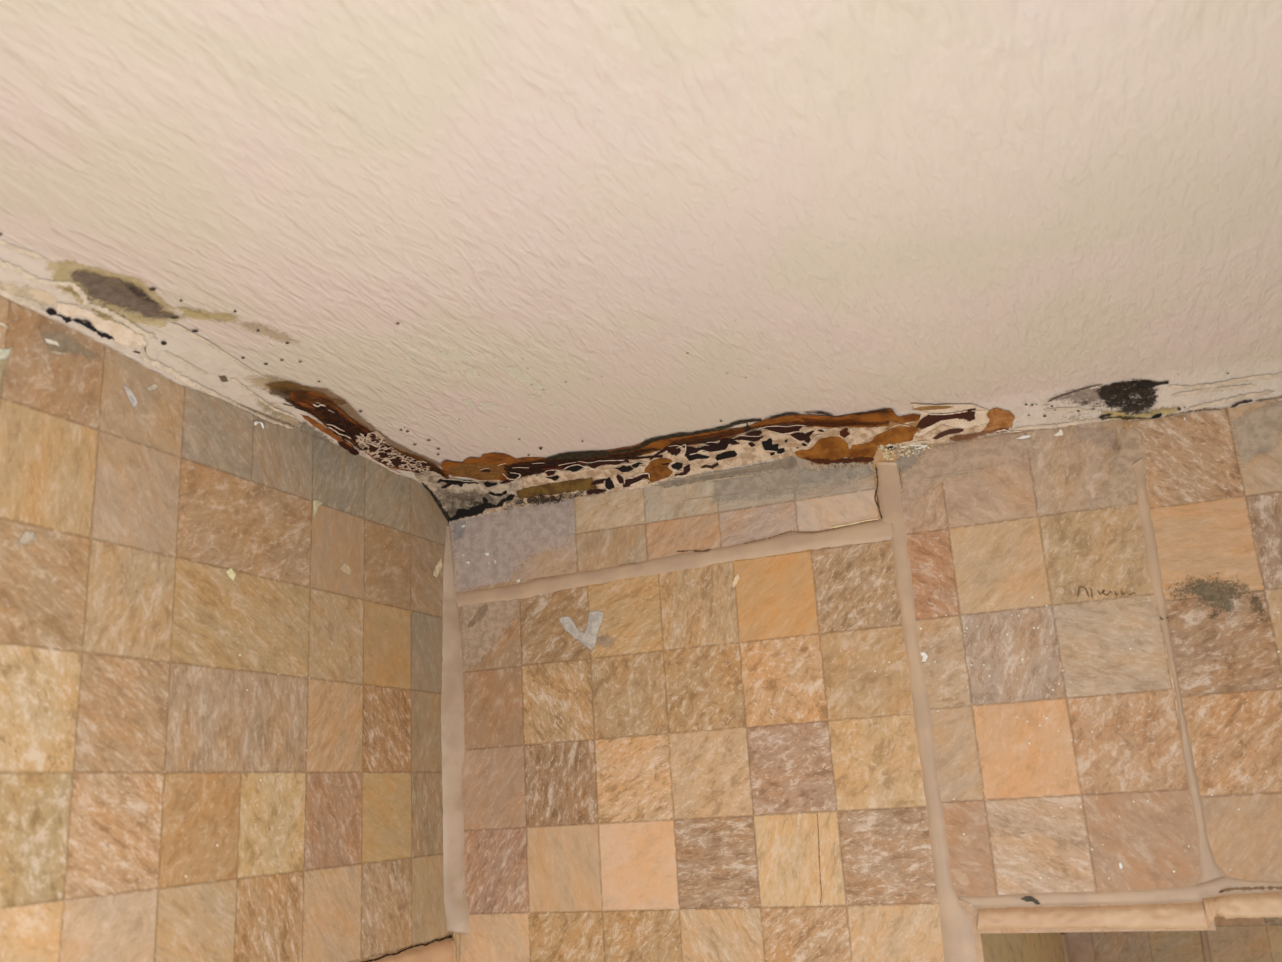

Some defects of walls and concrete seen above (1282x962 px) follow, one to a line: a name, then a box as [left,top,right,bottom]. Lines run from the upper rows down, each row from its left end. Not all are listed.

damp [49,261,237,345]
crack [46,309,146,354]
damp [1025,379,1200,420]
crack [1165,397,1279,417]
peeling [1168,372,1282,420]
peeling [313,402,1108,520]
damp [1168,572,1267,622]